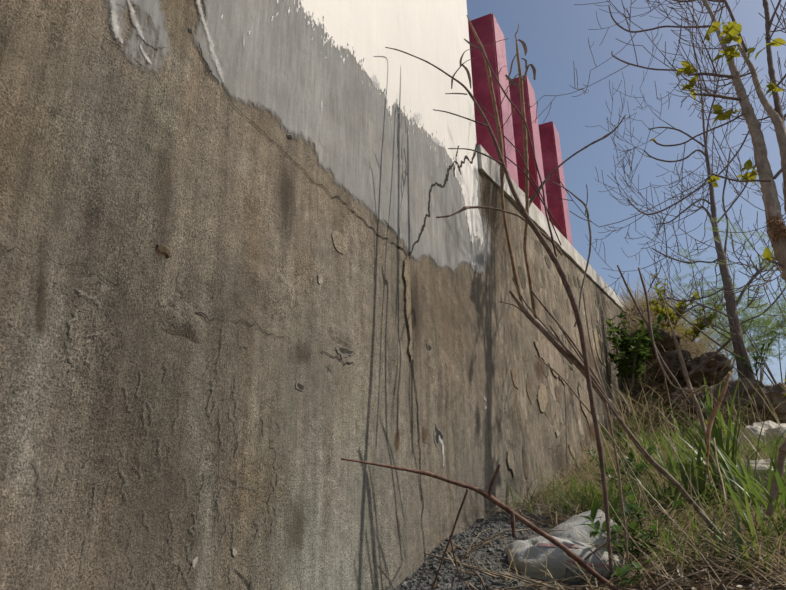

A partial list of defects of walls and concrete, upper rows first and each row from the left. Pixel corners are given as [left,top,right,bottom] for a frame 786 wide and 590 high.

efflorescence [110,0,123,43]
efflorescence [127,0,152,64]
peeling [271,0,335,59]
crack [199,43,477,258]
crack [194,312,291,343]
crack [411,359,426,557]